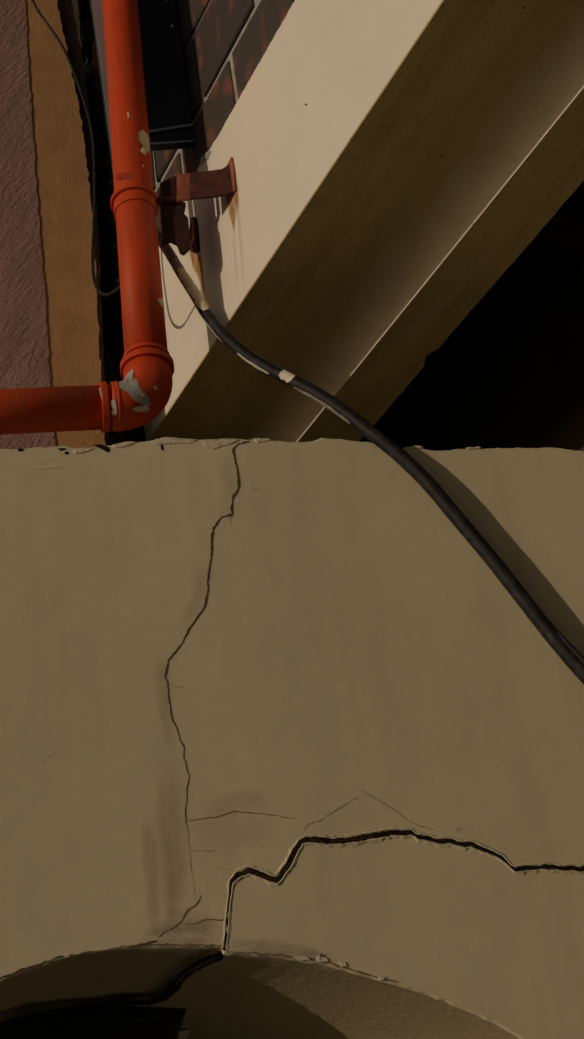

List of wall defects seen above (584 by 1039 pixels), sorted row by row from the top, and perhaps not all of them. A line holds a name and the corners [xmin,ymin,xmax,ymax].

corrosion [191,252,203,293]
crack [4,441,584,1023]